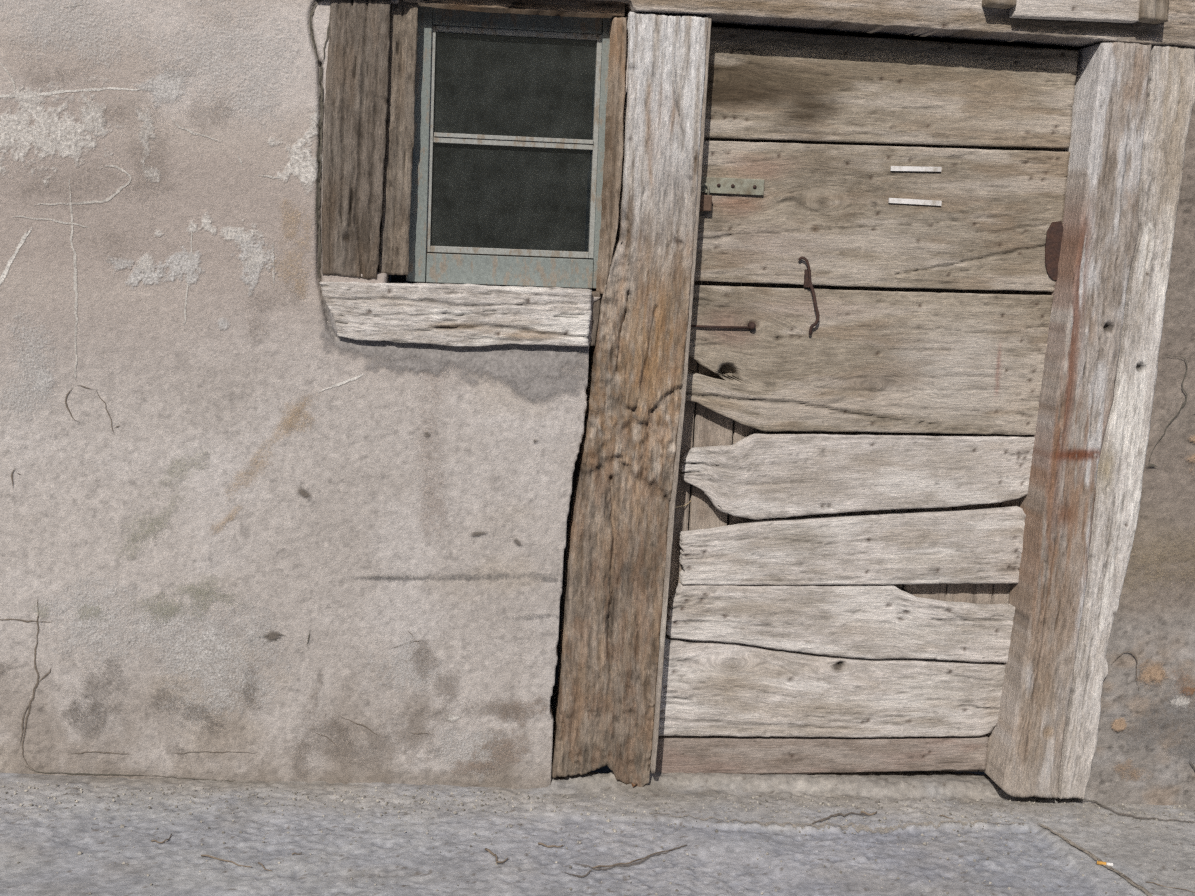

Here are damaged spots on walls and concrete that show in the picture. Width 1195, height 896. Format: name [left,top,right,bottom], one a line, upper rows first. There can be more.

peeling [0,82,118,183]
peeling [110,246,201,287]
peeling [188,215,276,295]
crack [0,599,257,782]